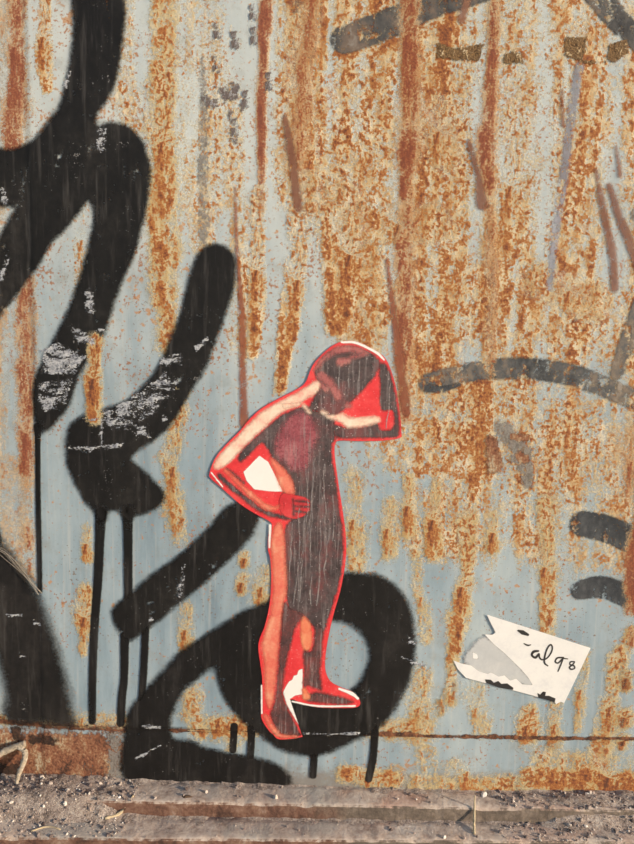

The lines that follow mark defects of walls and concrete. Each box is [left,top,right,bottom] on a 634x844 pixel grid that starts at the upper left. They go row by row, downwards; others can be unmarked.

rust [72,240,88,291]
rust [83,332,105,425]
rust [111,0,634,791]
rust [80,522,95,564]
rust [73,582,93,657]
rust [0,712,127,778]